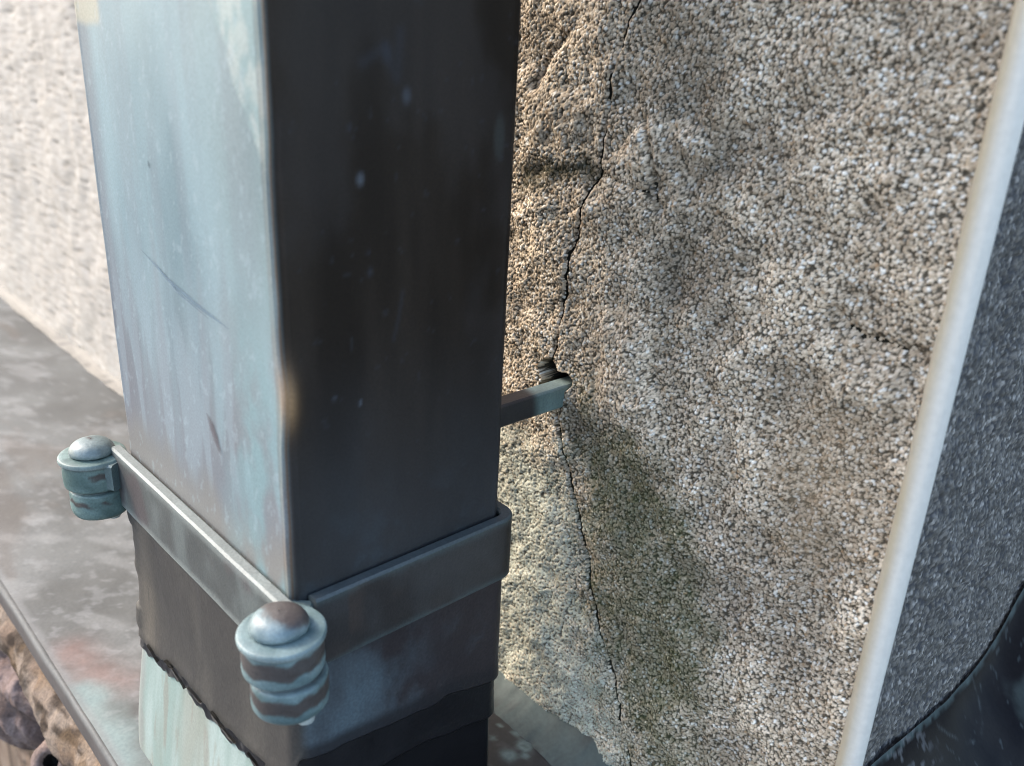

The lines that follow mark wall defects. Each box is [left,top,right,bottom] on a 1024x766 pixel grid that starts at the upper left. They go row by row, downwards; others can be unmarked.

crack [552,0,663,363]
crack [559,422,632,766]